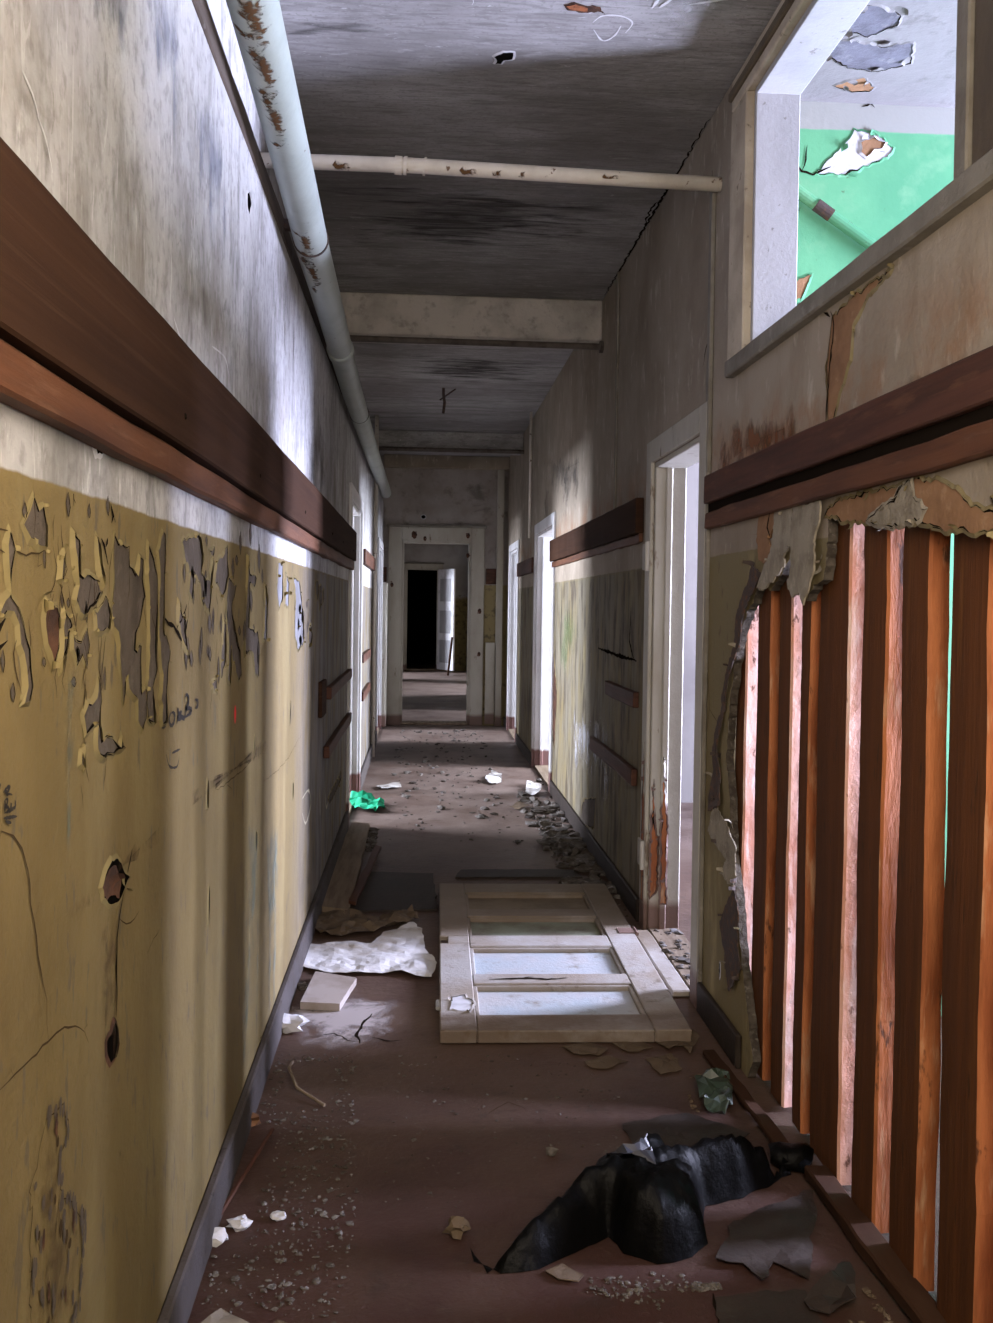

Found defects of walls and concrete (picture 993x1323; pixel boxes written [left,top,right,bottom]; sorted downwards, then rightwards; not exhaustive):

corrosion [233,0,286,149]
peeling [826,3,916,93]
peeling [815,128,896,178]
spalling [824,475,993,539]
peeling [0,490,322,781]
spalling [98,852,133,937]
spalling [104,954,120,1068]